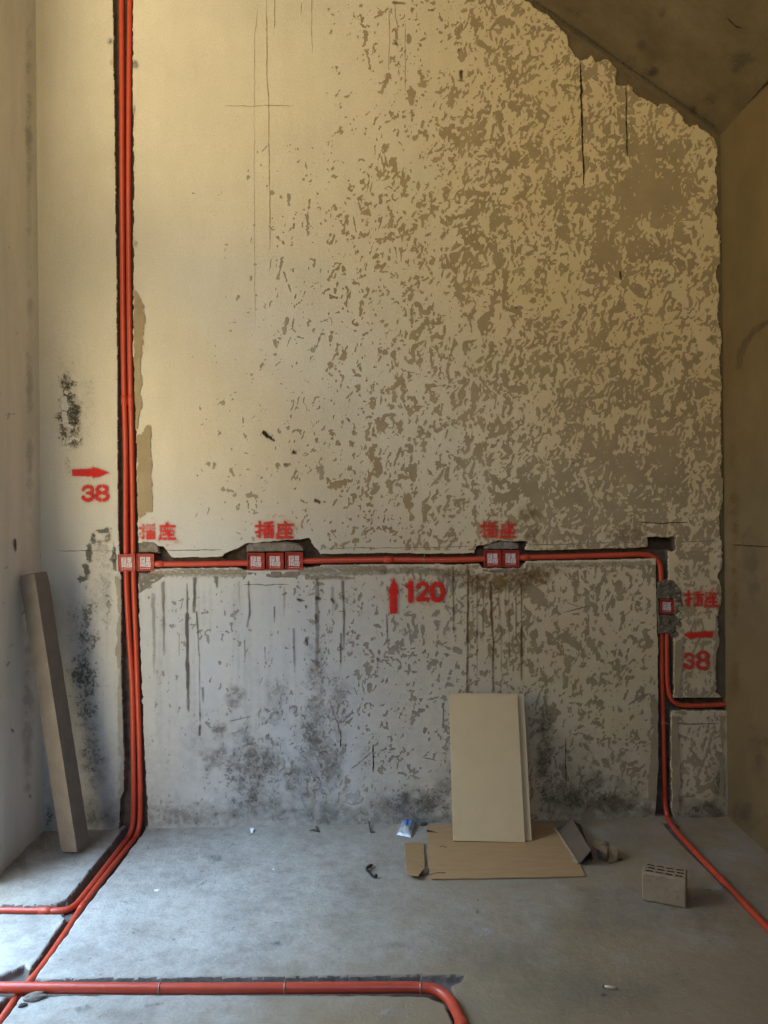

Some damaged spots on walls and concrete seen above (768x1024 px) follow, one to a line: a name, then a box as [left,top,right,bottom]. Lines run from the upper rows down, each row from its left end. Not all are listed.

crack [578,63,586,184]
crack [622,86,630,155]
leakage [55,375,82,448]
peeling [133,290,153,519]
peeling [196,0,724,698]
leakage [66,604,99,716]
leakage [185,577,198,708]